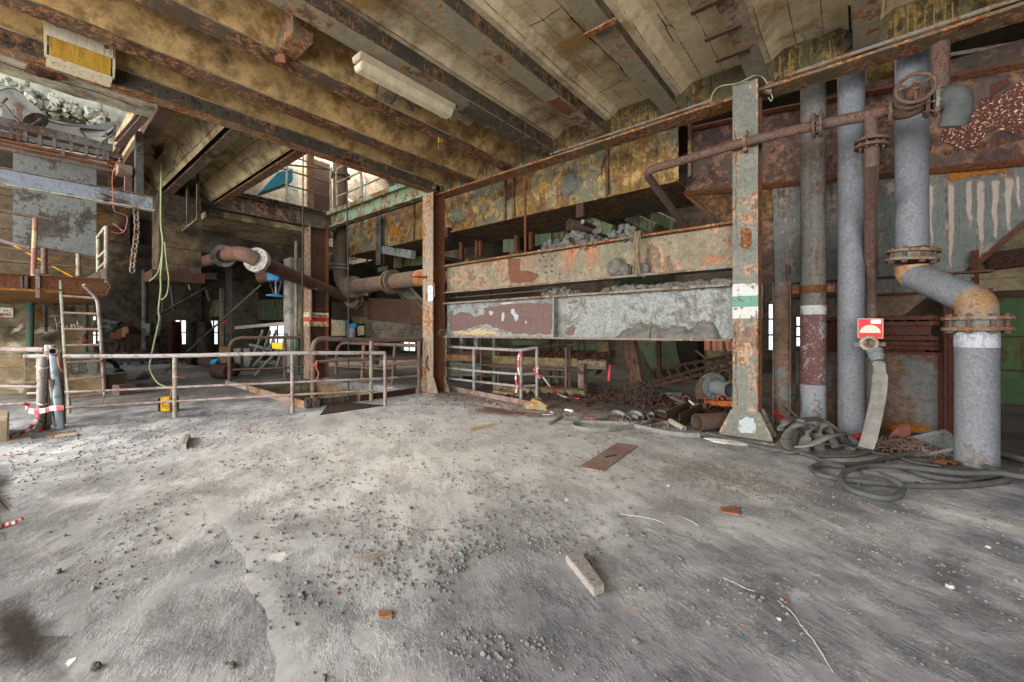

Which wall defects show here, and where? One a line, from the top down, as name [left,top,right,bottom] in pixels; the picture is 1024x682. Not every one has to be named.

peeling [933,76,1024,152]
corrosion [563,246,599,272]
corrosion [734,121,752,250]
leakage [929,176,1021,267]
peeling [450,302,552,335]